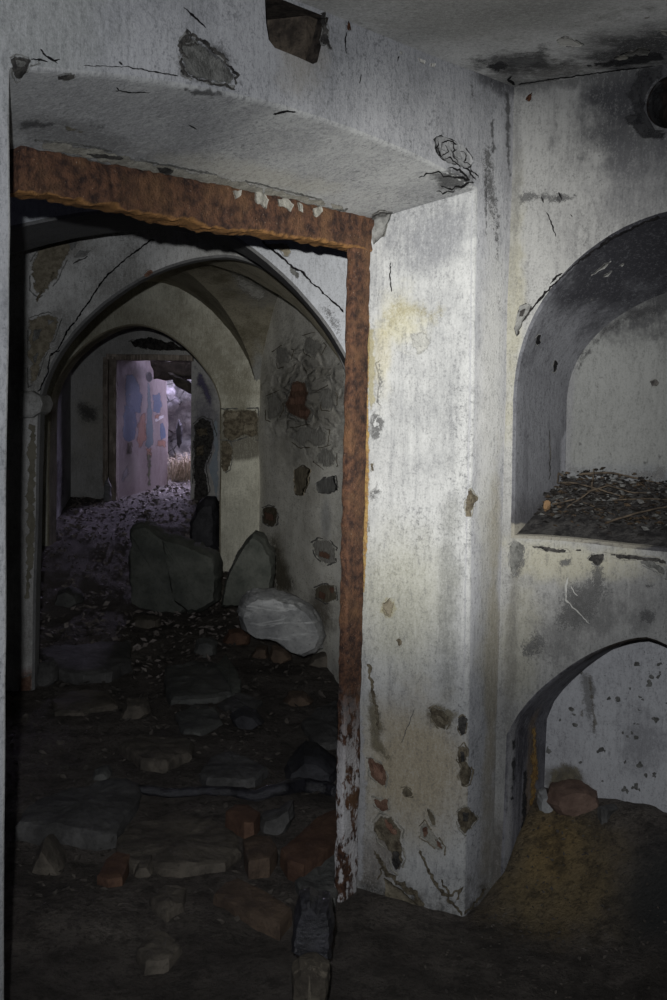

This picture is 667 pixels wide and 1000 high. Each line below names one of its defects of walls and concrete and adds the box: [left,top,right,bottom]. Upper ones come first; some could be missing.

crack [84,62,178,93]
flaking render [177,28,240,90]
leakage [474,47,561,75]
leakage [587,52,664,67]
crack [420,167,479,195]
crack [262,241,344,313]
crack [38,239,154,391]
flaking render [192,407,259,500]
flaking render [464,488,478,517]
flaking render [428,705,474,787]
flaking render [366,757,417,905]
crack [374,850,487,916]